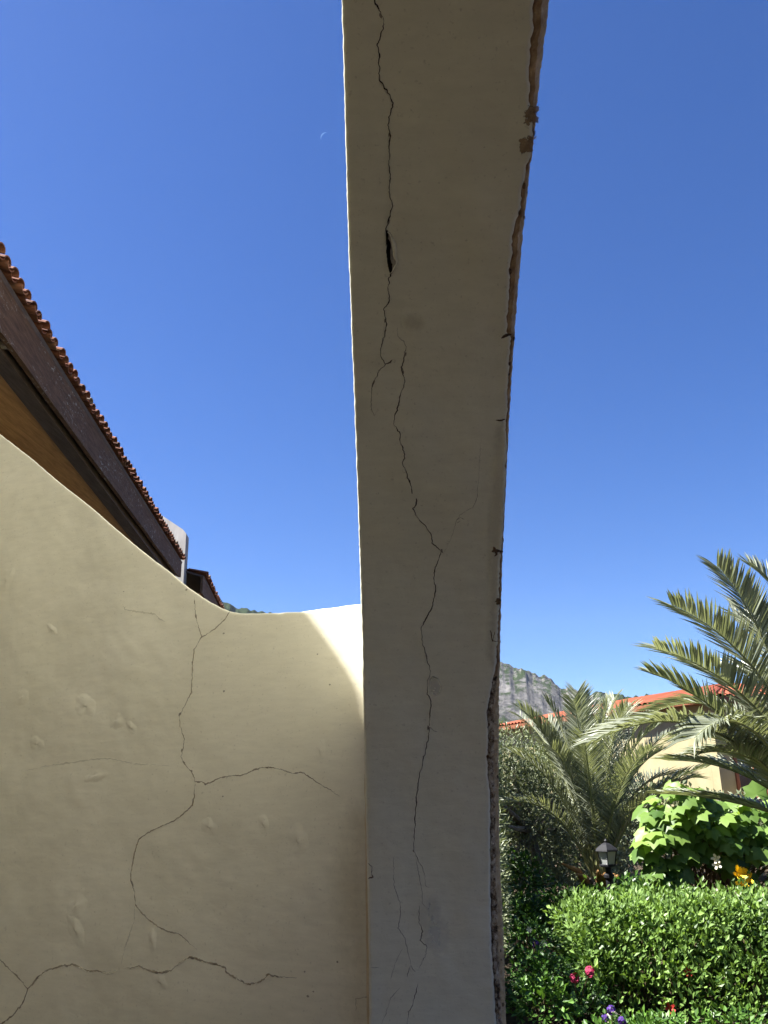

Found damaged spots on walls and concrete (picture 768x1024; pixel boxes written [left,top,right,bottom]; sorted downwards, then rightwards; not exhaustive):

crack [1,600,338,1024]
crack [371,0,481,1022]
spalling [486,0,549,1024]